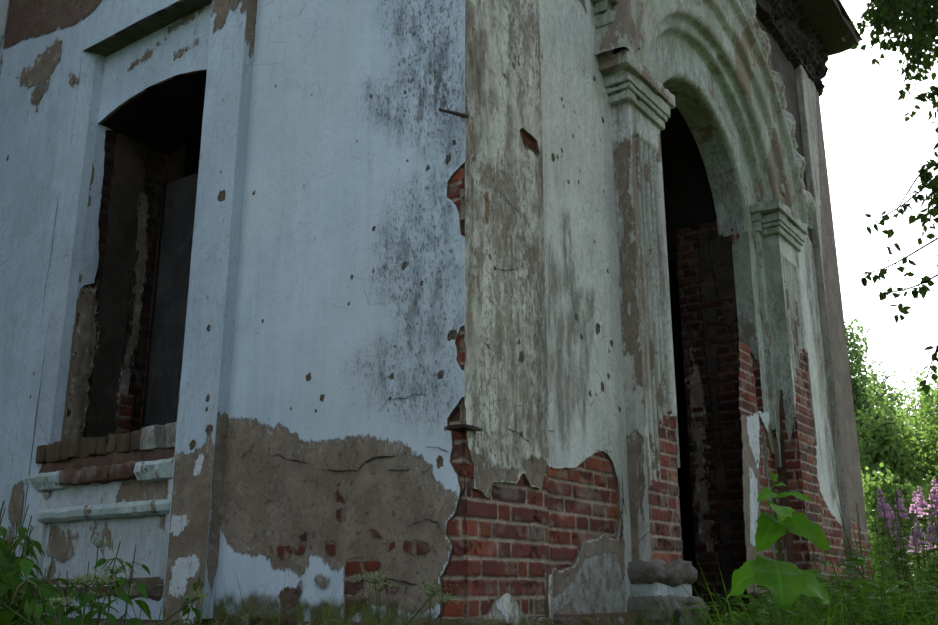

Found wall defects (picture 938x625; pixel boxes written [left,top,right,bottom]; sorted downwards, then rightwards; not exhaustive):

peeling [0,0,101,112]
peeling [129,0,257,72]
water stain [373,0,460,162]
water stain [378,177,455,328]
flaking render [448,166,465,236]
flaking render [520,130,535,154]
peeling [608,137,639,353]
flaking render [756,16,804,157]
flaking render [447,326,465,370]
peeling [738,90,874,596]
peeling [0,480,24,566]
peeling [115,394,683,624]